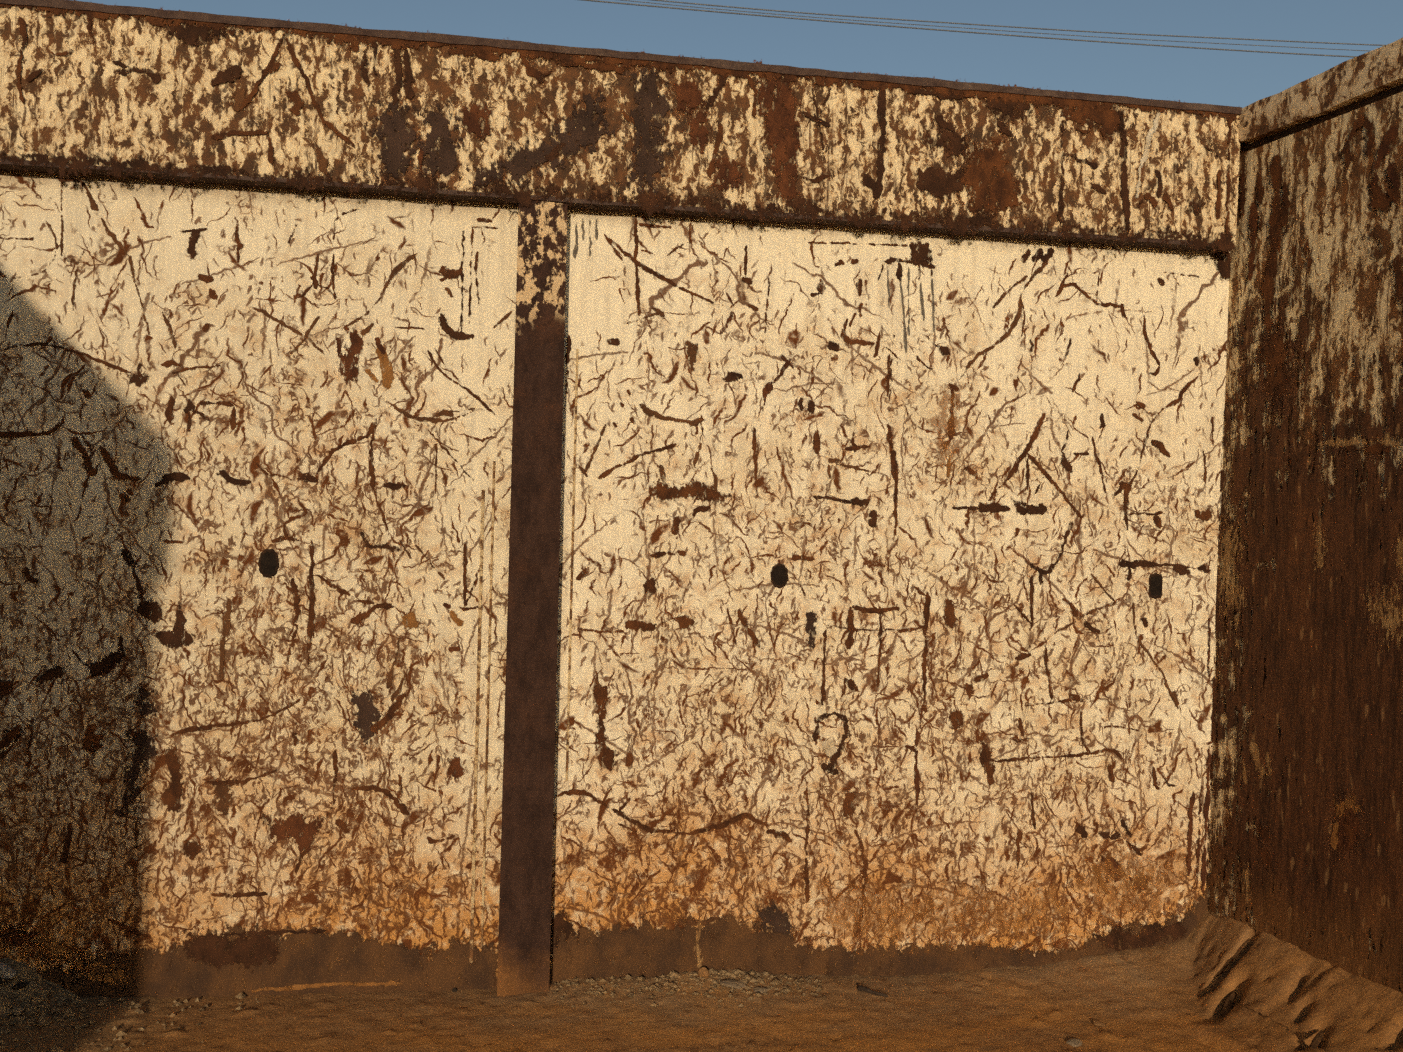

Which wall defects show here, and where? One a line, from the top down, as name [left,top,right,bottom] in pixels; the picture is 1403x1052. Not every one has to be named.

rust [0,0,1239,281]
peeling [1136,112,1161,198]
rust [1341,115,1403,305]
rust [198,274,218,299]
rust [438,266,462,297]
rust [128,363,149,387]
rust [336,323,395,389]
rust [549,154,1403,994]
rust [347,689,406,745]
rust [113,684,184,850]
rust [260,812,348,873]
rust [37,923,498,998]